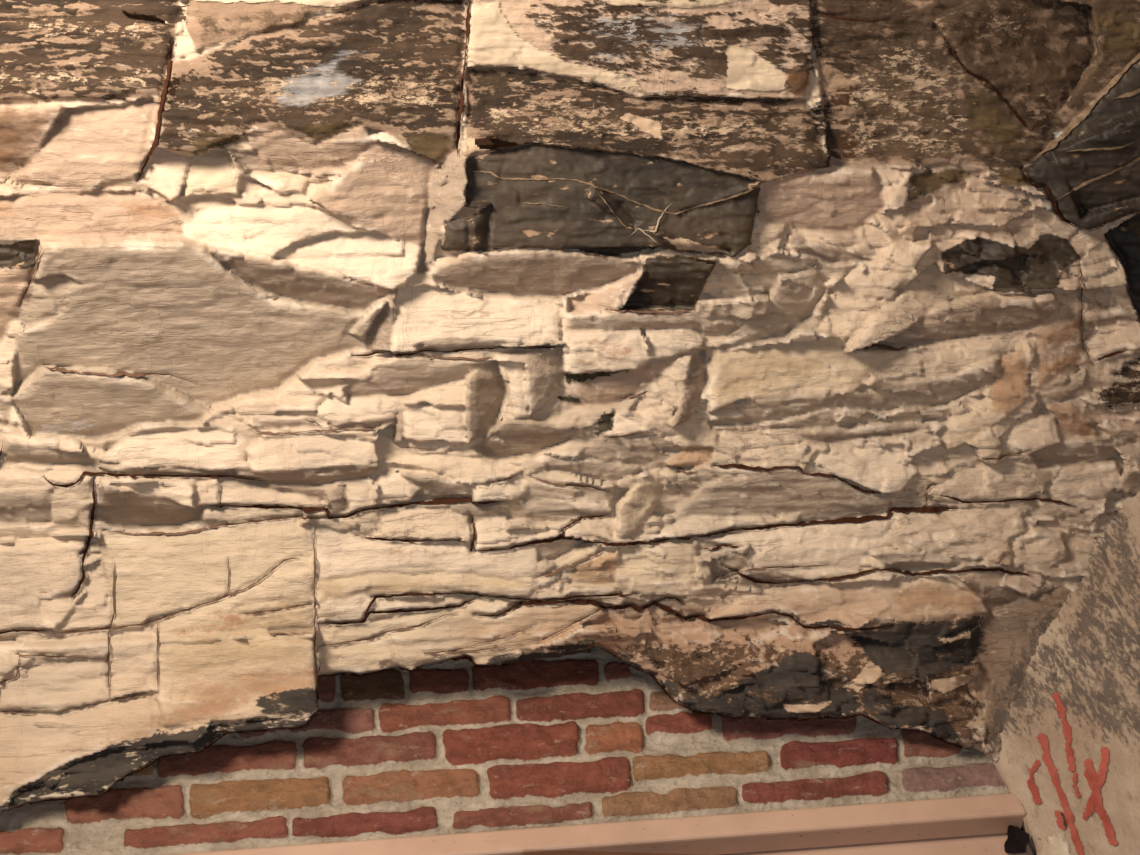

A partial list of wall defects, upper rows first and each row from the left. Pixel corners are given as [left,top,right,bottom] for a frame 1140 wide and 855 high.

leakage [20,13,149,42]
leakage [587,0,705,62]
leakage [181,51,444,115]
crack [138,42,173,181]
leakage [486,96,811,146]
crack [44,366,195,384]
crack [975,450,1031,460]
crack [0,464,1075,811]
spalling [938,630,971,643]
spalling [843,661,884,692]
spalling [930,674,972,693]
spalling [783,701,831,713]